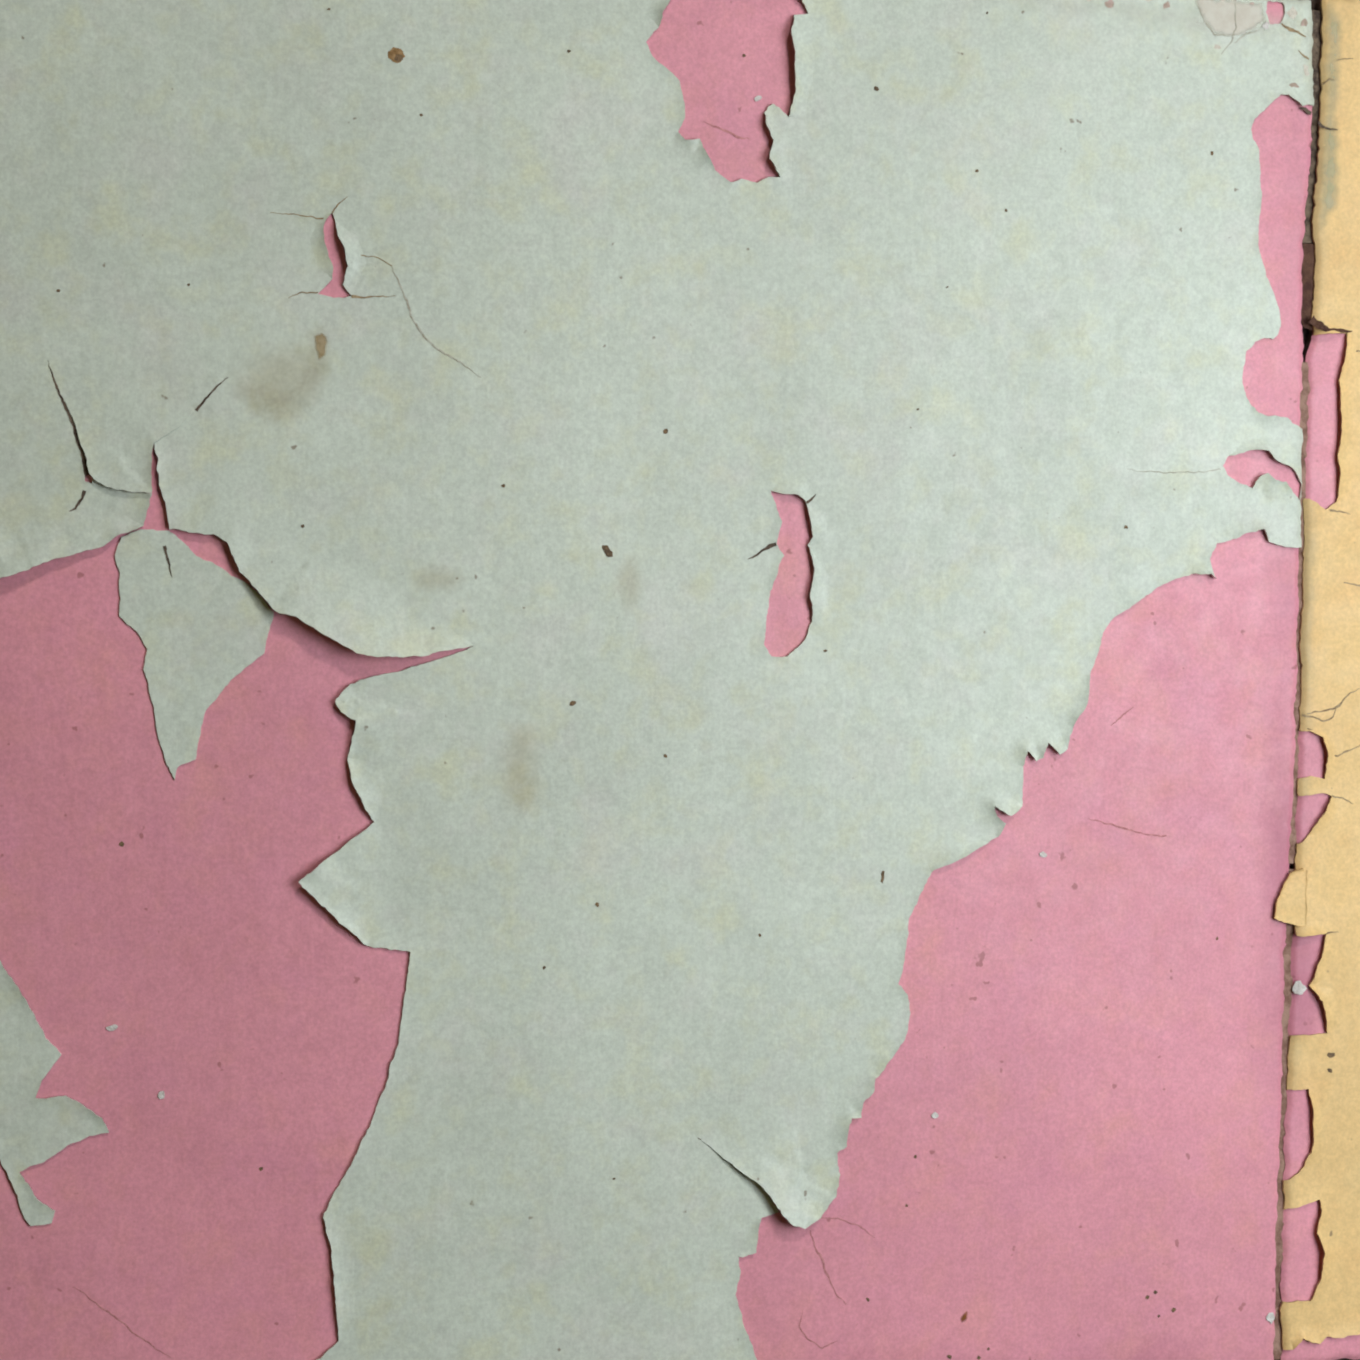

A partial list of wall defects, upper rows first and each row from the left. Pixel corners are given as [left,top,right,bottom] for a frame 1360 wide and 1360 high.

peeling [646,0,816,183]
crack [270,196,348,219]
crack [351,255,480,377]
crack [48,361,89,512]
crack [195,377,228,412]
peeling [700,64,1360,1360]
peeling [0,367,474,1360]